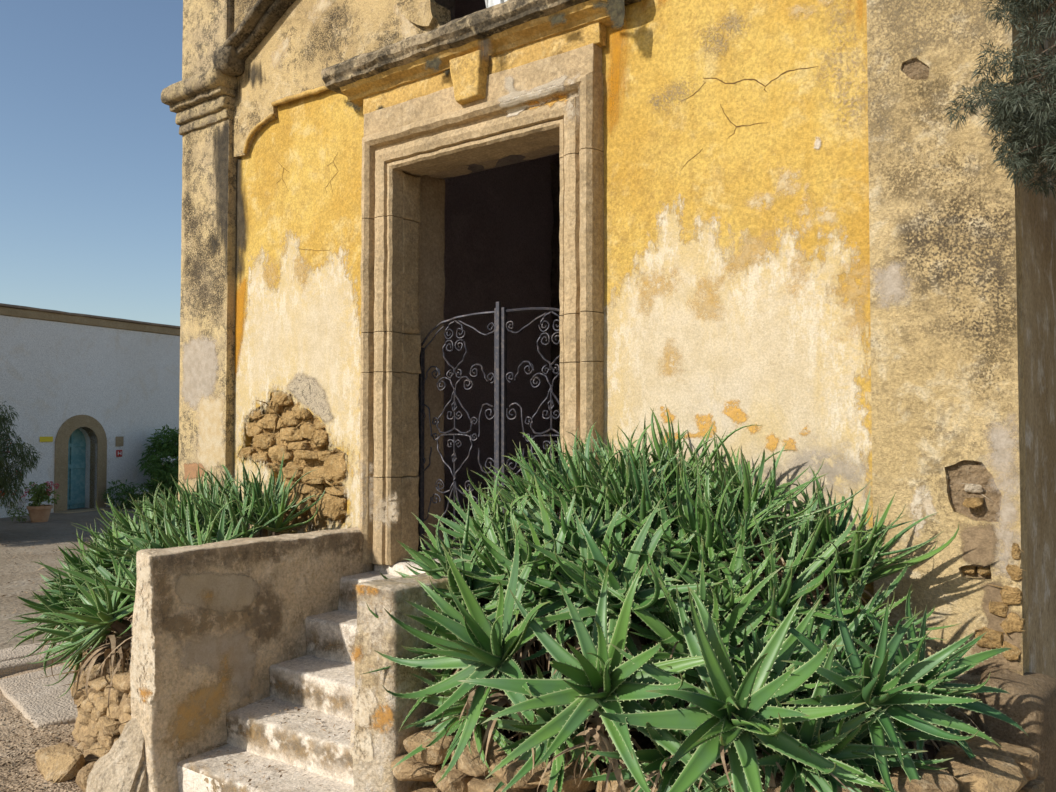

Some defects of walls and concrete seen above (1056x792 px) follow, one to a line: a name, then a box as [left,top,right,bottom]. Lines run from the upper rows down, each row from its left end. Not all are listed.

damp [234,65,262,99]
damp [305,8,343,61]
crack [684,66,818,138]
damp [832,0,994,131]
damp [185,121,246,321]
peeling [184,231,361,538]
peeling [602,171,872,558]
damp [889,154,1016,382]
spalling [946,460,1028,674]